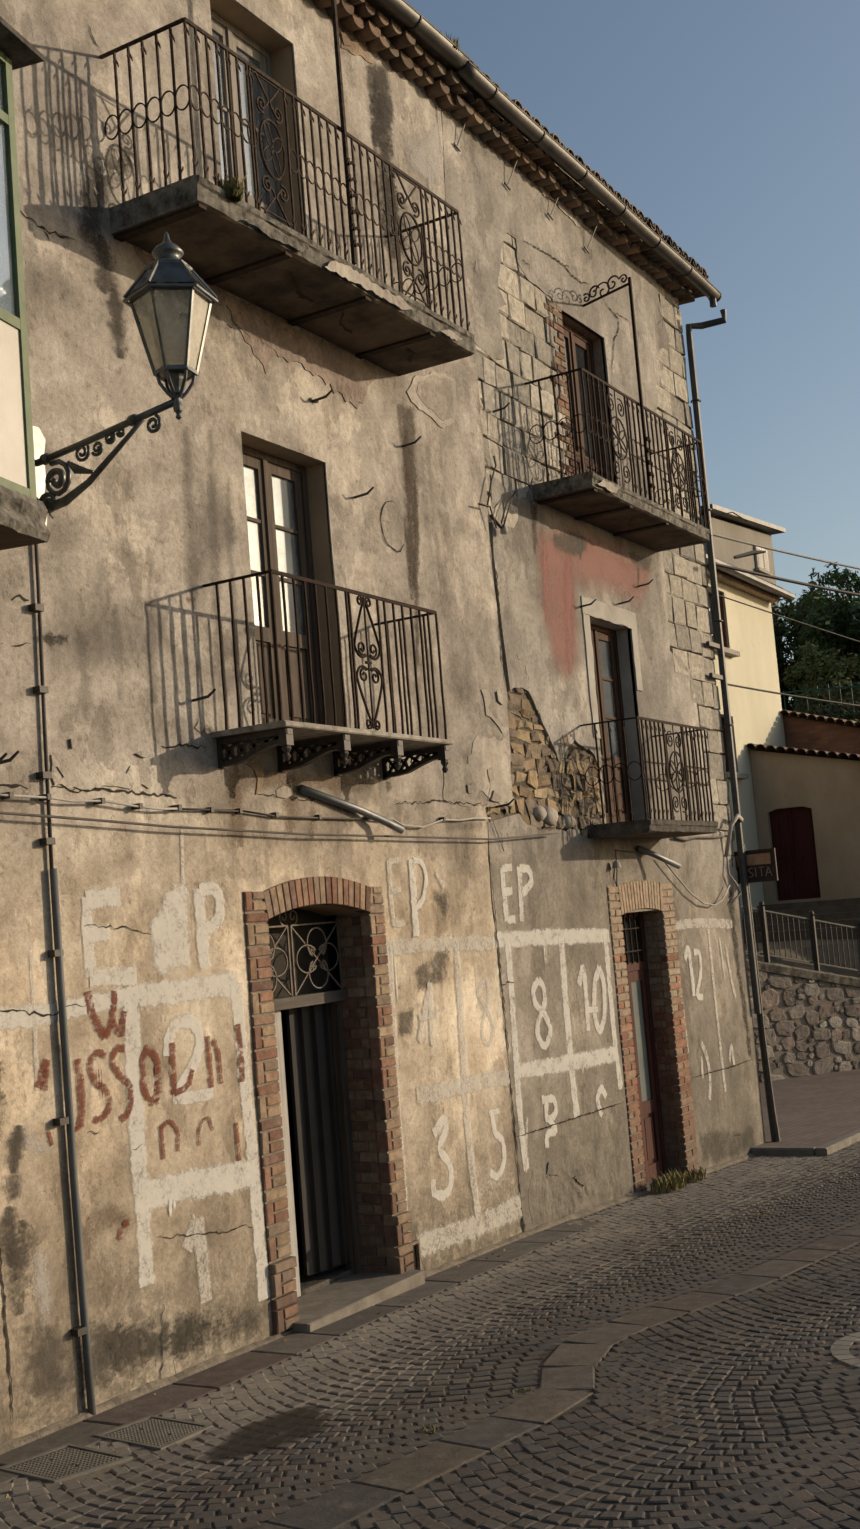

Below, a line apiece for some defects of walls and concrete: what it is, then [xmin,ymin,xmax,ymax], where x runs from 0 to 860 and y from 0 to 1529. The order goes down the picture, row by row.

damp [366,64,442,190]
flaking render [443,682,603,838]